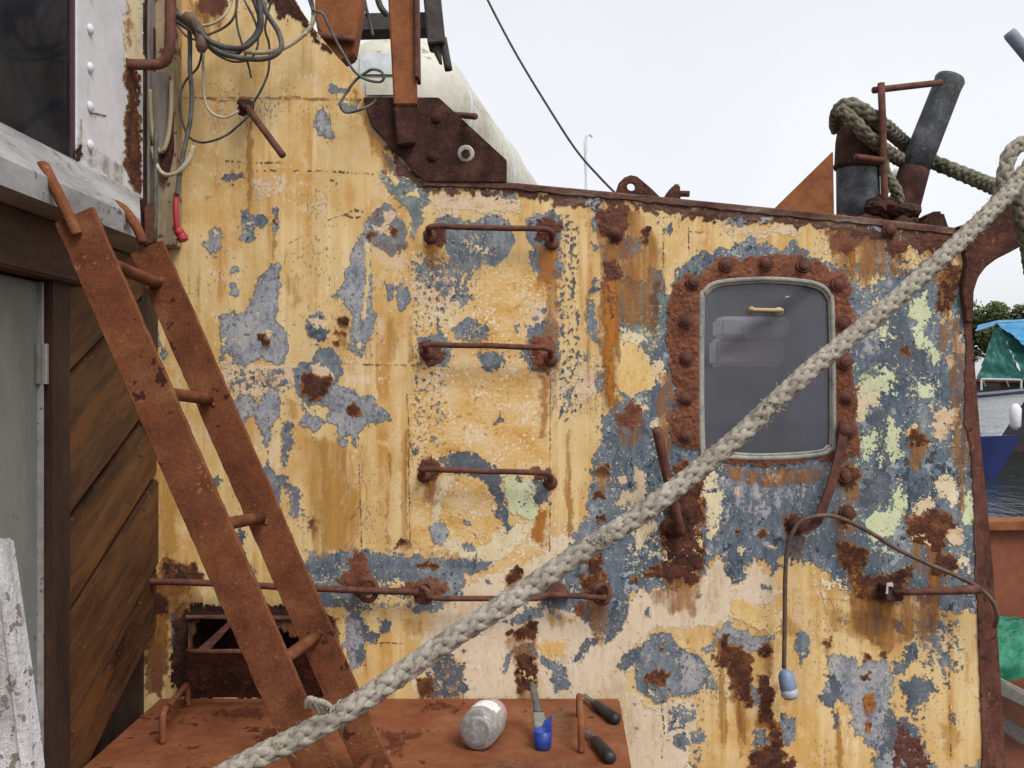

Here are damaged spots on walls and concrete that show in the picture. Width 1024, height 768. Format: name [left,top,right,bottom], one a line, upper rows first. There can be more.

rust [122,58,145,195]
rust [275,610,297,637]
peeling [302,519,493,670]
rust [505,552,611,699]
peeling [218,151,929,551]
peeling [499,509,682,696]
rust [364,122,952,445]
rust [656,373,690,476]
rust [642,478,711,614]
rust [711,633,797,768]
peeling [616,253,977,768]
rust [832,262,969,652]